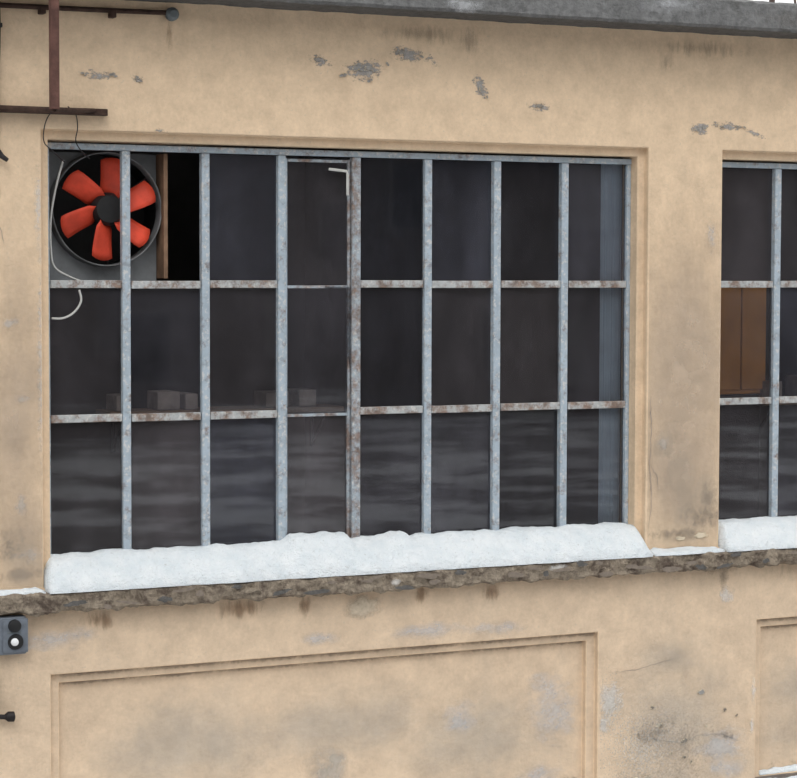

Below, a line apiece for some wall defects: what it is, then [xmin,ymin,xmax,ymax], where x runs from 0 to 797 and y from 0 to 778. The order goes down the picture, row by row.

peeling [393,47,435,64]
peeling [80,69,118,79]
peeling [339,61,390,82]
peeling [473,77,488,99]
peeling [691,122,759,136]